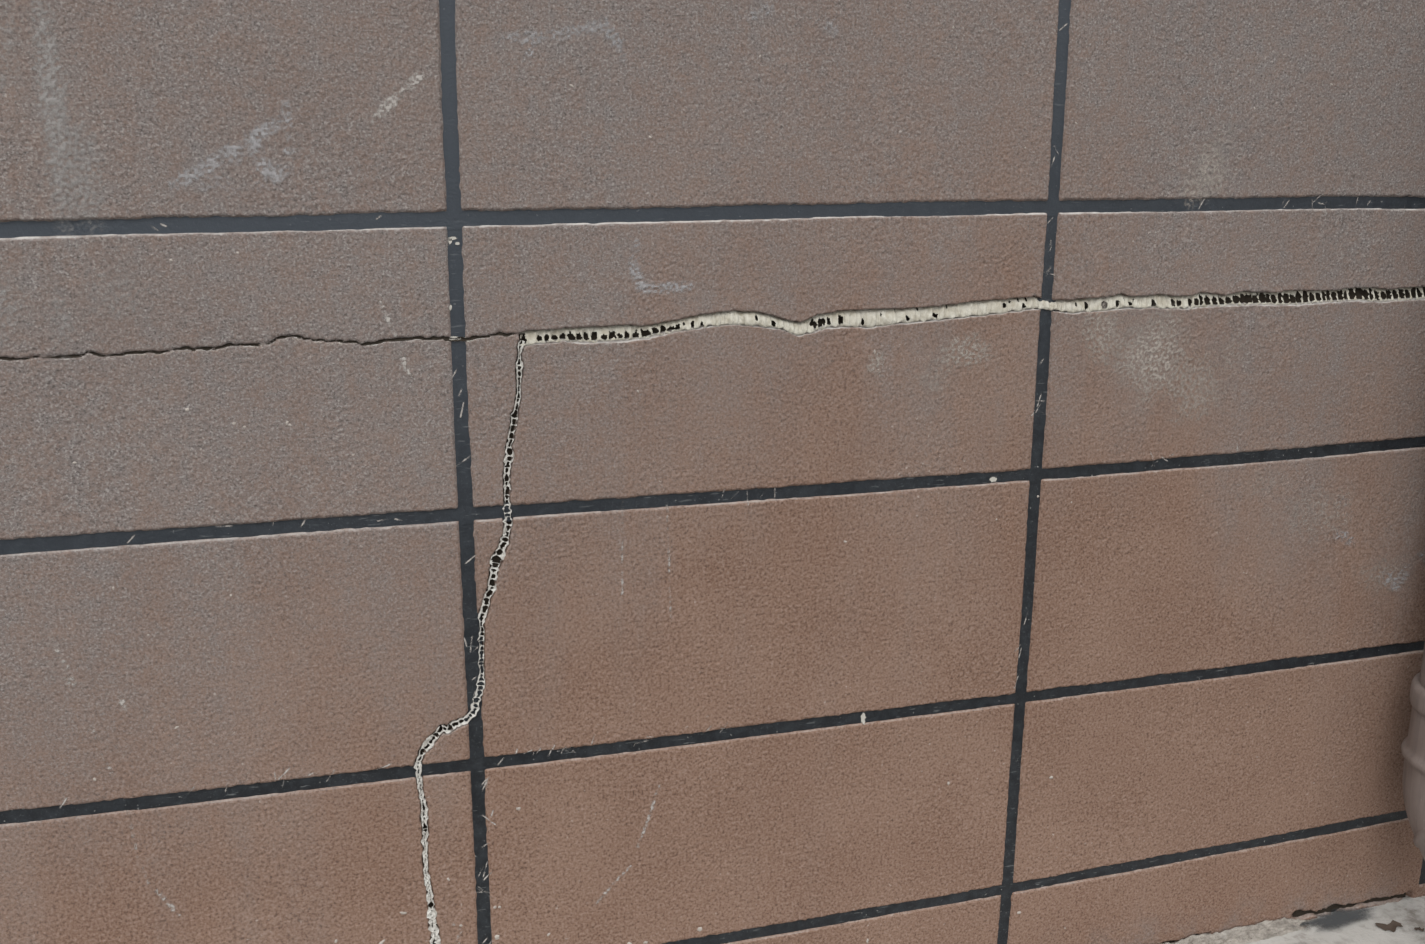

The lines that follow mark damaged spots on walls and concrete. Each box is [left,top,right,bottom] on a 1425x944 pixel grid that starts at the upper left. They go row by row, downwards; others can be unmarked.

crack [0,287,1425,944]